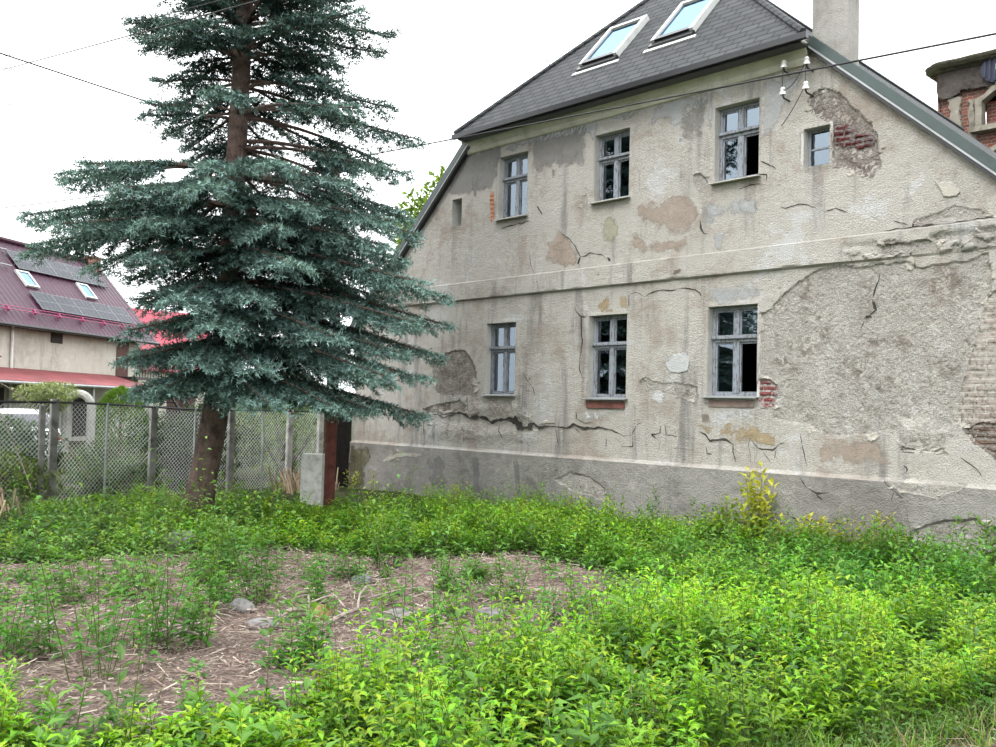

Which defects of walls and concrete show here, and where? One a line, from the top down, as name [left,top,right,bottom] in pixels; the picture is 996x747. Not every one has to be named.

flaking render [804,88,885,181]
crack [861,274,880,328]
spalling [757,182,996,460]
spalling [423,350,480,419]
spalling [554,471,607,501]
crack [423,405,842,524]